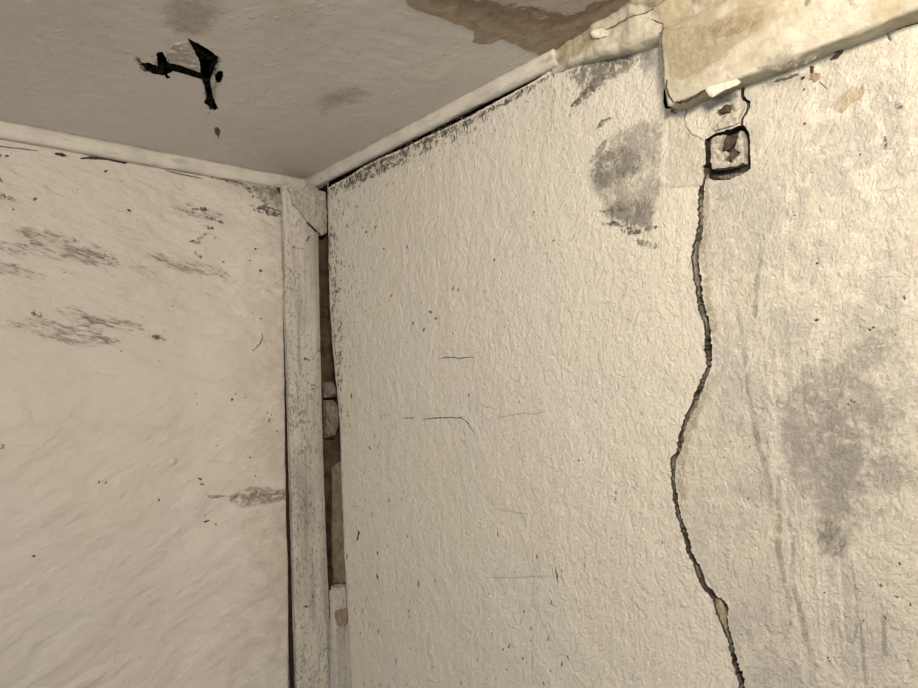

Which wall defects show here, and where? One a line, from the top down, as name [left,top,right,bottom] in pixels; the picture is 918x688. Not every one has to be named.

leakage [405,0,663,61]
flaking render [590,28,609,39]
crack [605,8,751,140]
crack [774,73,799,82]
peeling [801,66,828,91]
crack [830,50,844,60]
leakage [327,75,549,197]
leakage [590,125,661,249]
crack [670,165,745,688]